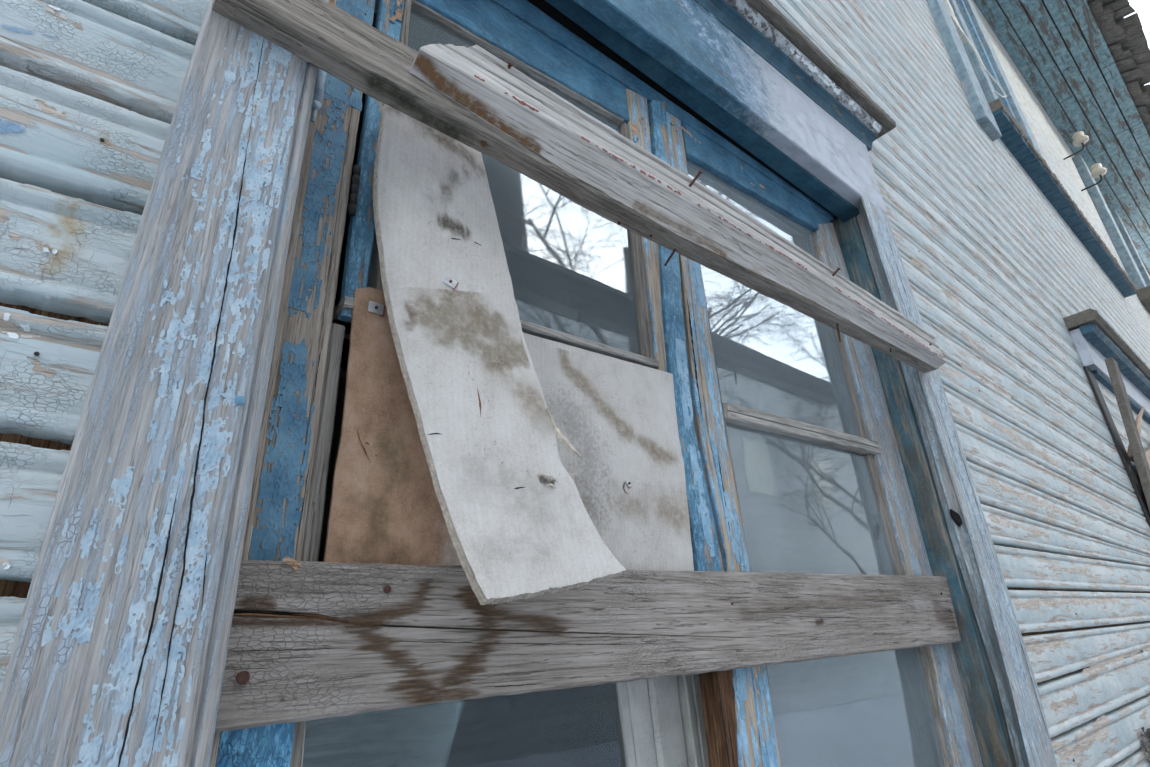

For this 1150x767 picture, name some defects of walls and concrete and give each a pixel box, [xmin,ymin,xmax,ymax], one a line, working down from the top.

peeling [288,73,362,318]
peeling [329,0,375,26]
rust [414,54,540,154]
peeling [692,261,707,308]
peeling [72,26,296,767]
crack [118,40,264,767]
peeling [249,339,315,561]
peeling [675,338,715,557]
peeling [41,466,135,669]
leakage [232,581,567,704]
crack [227,610,655,651]
peeling [733,668,776,767]